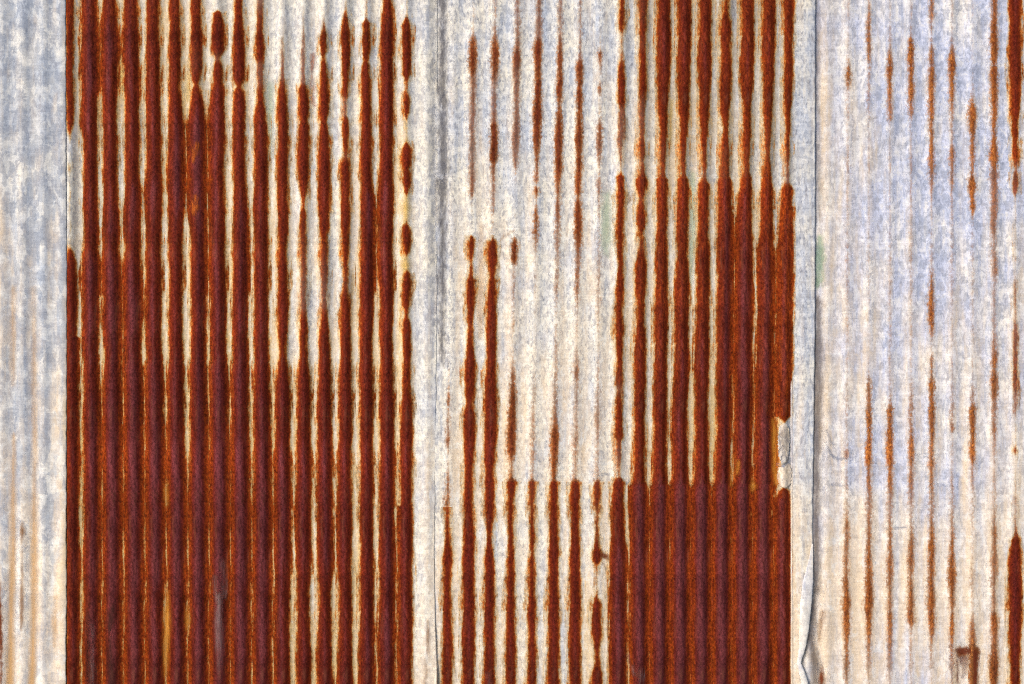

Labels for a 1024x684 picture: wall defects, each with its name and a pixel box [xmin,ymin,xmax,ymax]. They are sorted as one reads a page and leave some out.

corrosion [907,36,915,116]
corrosion [927,0,935,194]
corrosion [966,98,977,216]
corrosion [989,0,1024,276]
corrosion [66,0,417,684]
corrosion [428,0,796,684]
corrosion [842,514,851,678]
corrosion [864,378,874,666]
corrosion [885,404,895,666]
corrosion [907,355,1024,684]
corrosion [990,336,999,441]
corrosion [1012,283,1020,414]